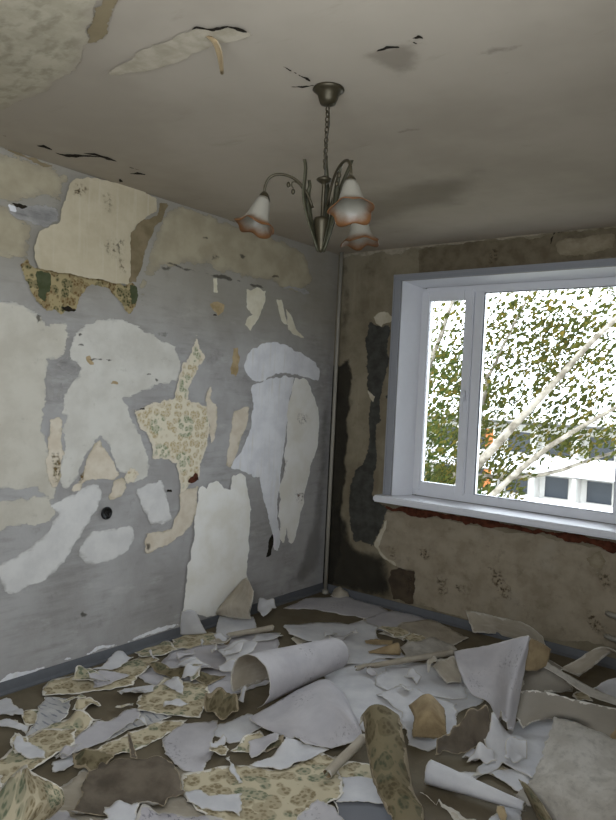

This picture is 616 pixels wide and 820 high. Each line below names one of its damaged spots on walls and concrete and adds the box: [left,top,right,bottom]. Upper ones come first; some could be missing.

peeling [0,0,118,109]
peeling [109,26,250,75]
flaking render [8,203,59,227]
peeling [276,300,304,338]
flaking render [46,357,78,401]
peeling [205,387,217,443]
peeling [278,378,319,544]
peeling [349,312,616,554]
peeling [145,486,199,554]